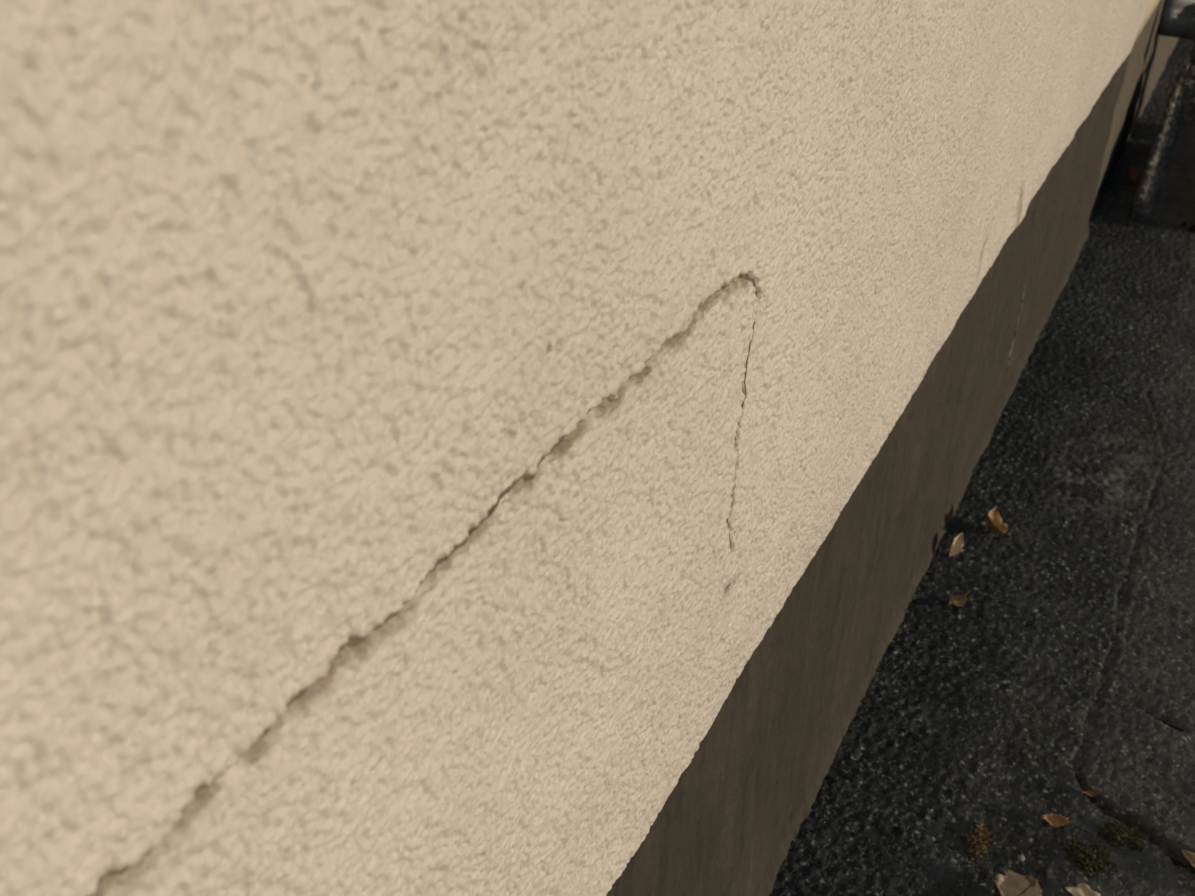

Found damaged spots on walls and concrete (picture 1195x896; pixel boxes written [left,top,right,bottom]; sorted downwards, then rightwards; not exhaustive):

crack [182,274,757,810]
crack [90,849,153,896]